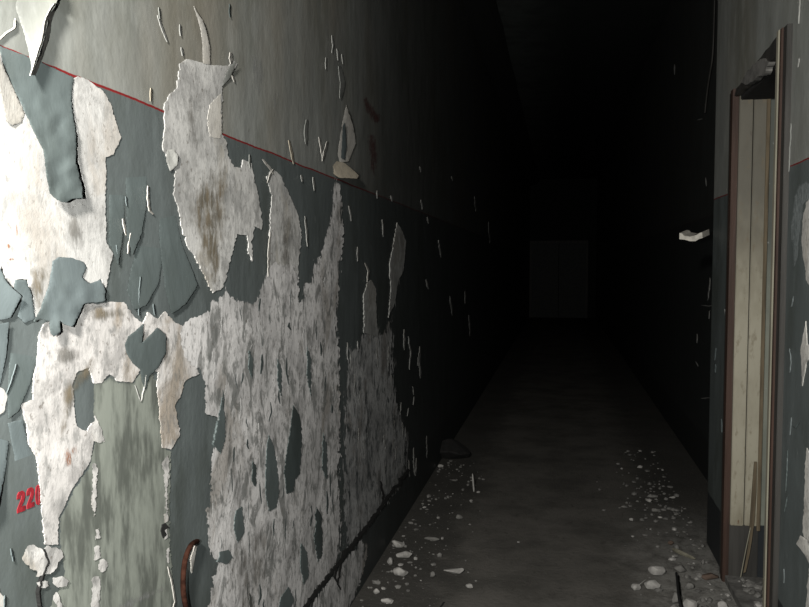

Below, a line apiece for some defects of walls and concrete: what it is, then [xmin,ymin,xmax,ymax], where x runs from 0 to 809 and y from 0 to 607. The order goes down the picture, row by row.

peeling [801,199,809,284]
peeling [0,7,428,607]
peeling [789,322,809,386]
peeling [796,448,809,563]